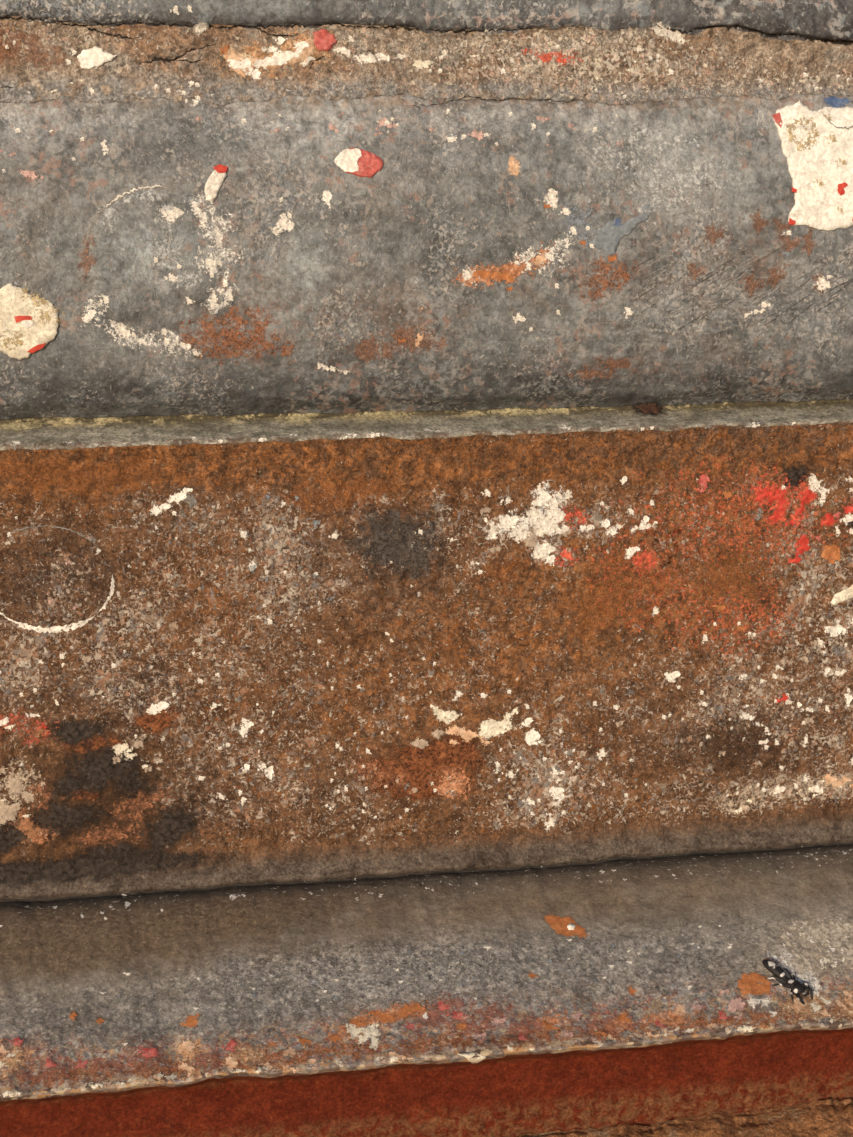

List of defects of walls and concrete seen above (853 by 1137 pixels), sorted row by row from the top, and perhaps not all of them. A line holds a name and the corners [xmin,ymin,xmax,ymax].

crack [0,16,591,64]
peeling [773,65,853,235]
peeling [0,283,202,360]
rust [174,305,295,365]
rust [132,708,181,734]
rust [7,811,61,845]
rust [73,821,153,849]
water stain [0,716,233,885]
rust [348,732,486,803]
rust [0,1001,853,1092]